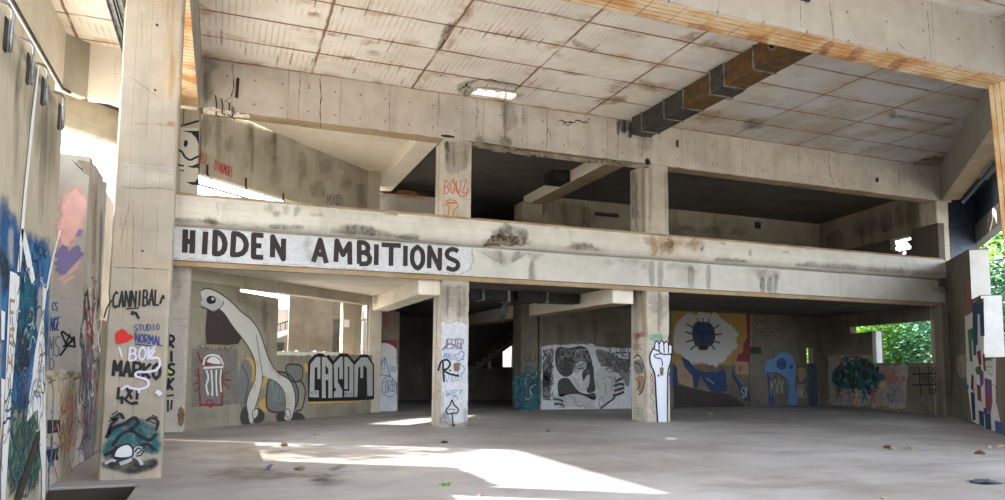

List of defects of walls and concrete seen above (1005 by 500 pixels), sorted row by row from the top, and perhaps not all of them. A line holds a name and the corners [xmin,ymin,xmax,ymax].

crack [201,9,633,128]
spalling [466,86,524,100]
spalling [203,95,250,119]
crack [546,119,590,150]
spalling [483,233,529,247]